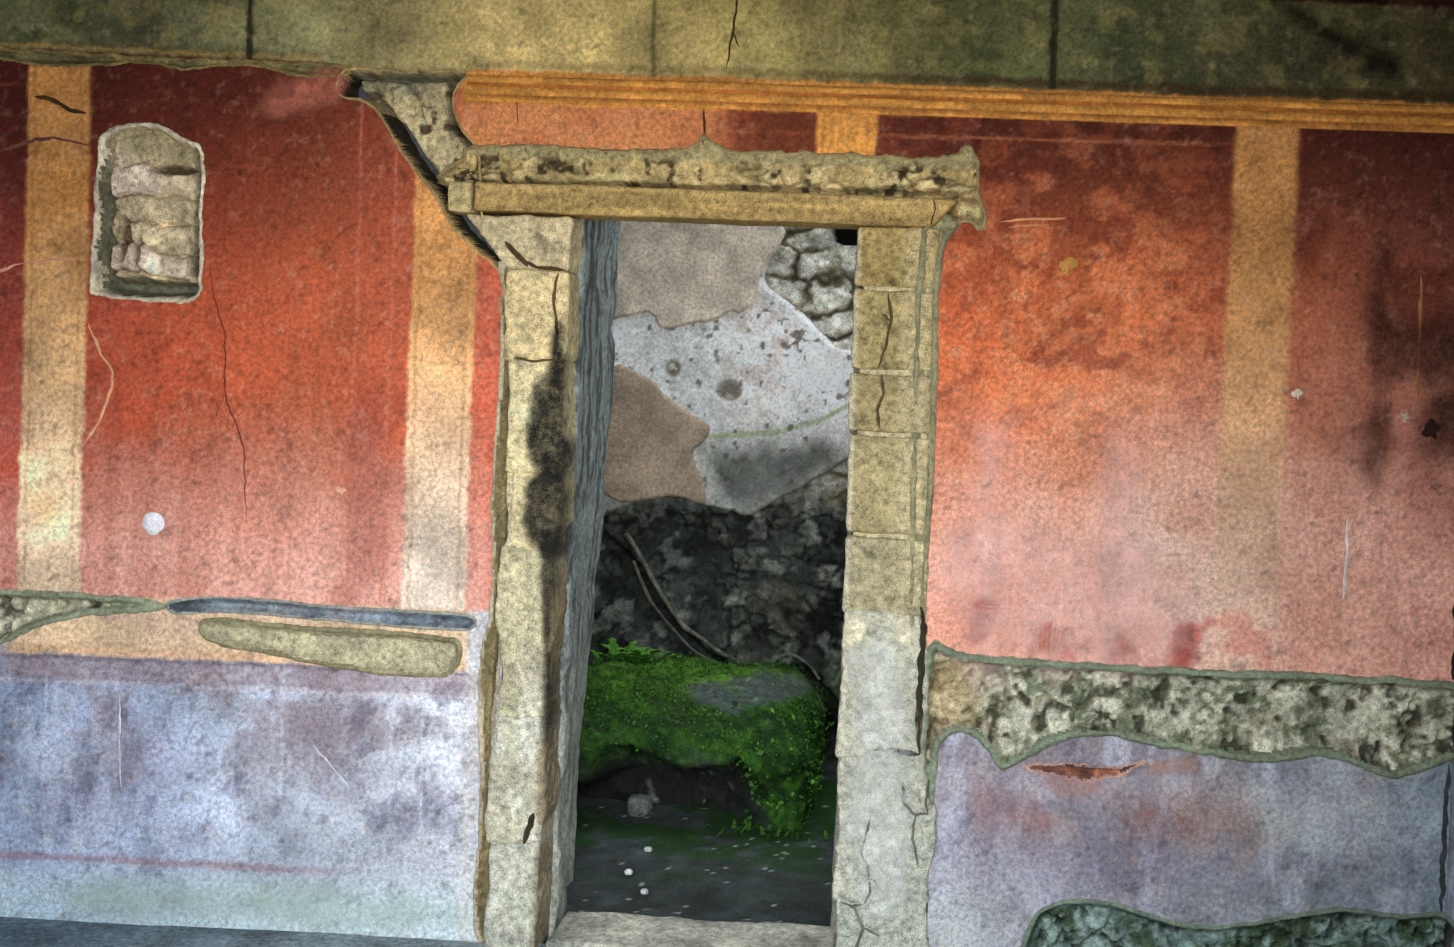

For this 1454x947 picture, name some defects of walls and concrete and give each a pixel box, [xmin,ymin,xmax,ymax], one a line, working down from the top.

crack [726,0,740,69]
flaking render [0,46,987,304]
peeling [613,221,786,329]
crack [876,293,893,429]
flaking render [0,588,166,645]
crack [840,607,929,947]
rust [1022,760,1170,782]
flaking render [922,639,1454,805]
flaking render [1020,898,1454,947]